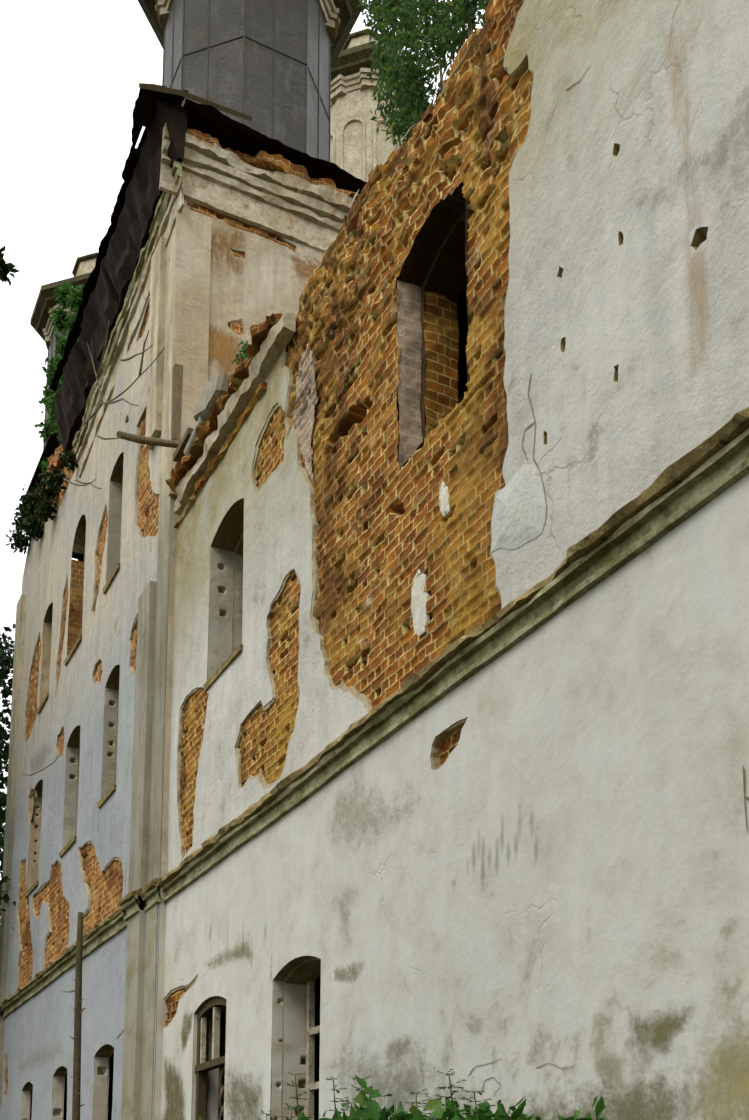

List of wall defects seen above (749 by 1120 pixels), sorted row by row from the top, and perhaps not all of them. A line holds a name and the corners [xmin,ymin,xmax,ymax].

spalling [691,227,708,250]
spalling [227,319,244,335]
spalling [125,407,159,538]
spalling [234,0,533,789]
crack [521,374,547,521]
spalling [177,687,209,859]
spalling [17,840,123,991]
leakage [634,1015,685,1048]
leakage [534,1083,676,1120]